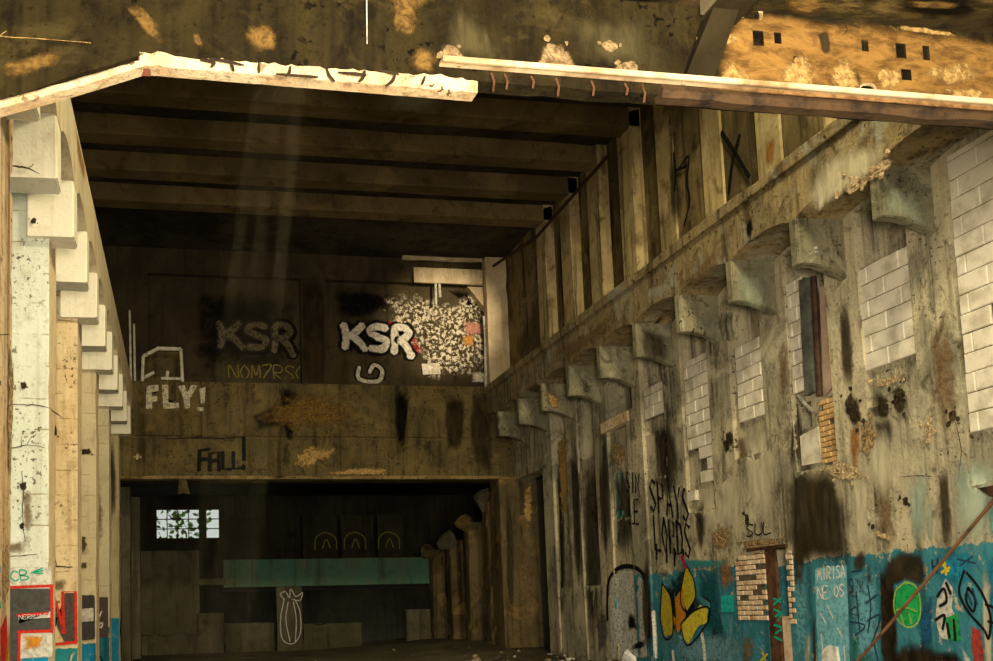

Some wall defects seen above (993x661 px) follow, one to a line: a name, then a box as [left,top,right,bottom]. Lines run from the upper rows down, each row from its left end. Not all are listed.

spalling [0,44,478,117]
peeling [247,26,274,48]
peeling [393,0,423,33]
peeling [722,0,993,99]
spalling [835,148,890,199]
leakage [395,395,408,443]
leakage [791,409,802,460]
flaking render [818,386,878,486]
leakage [854,422,894,537]
flaking render [708,524,797,624]
leakage [791,474,845,596]
leakage [854,552,959,661]